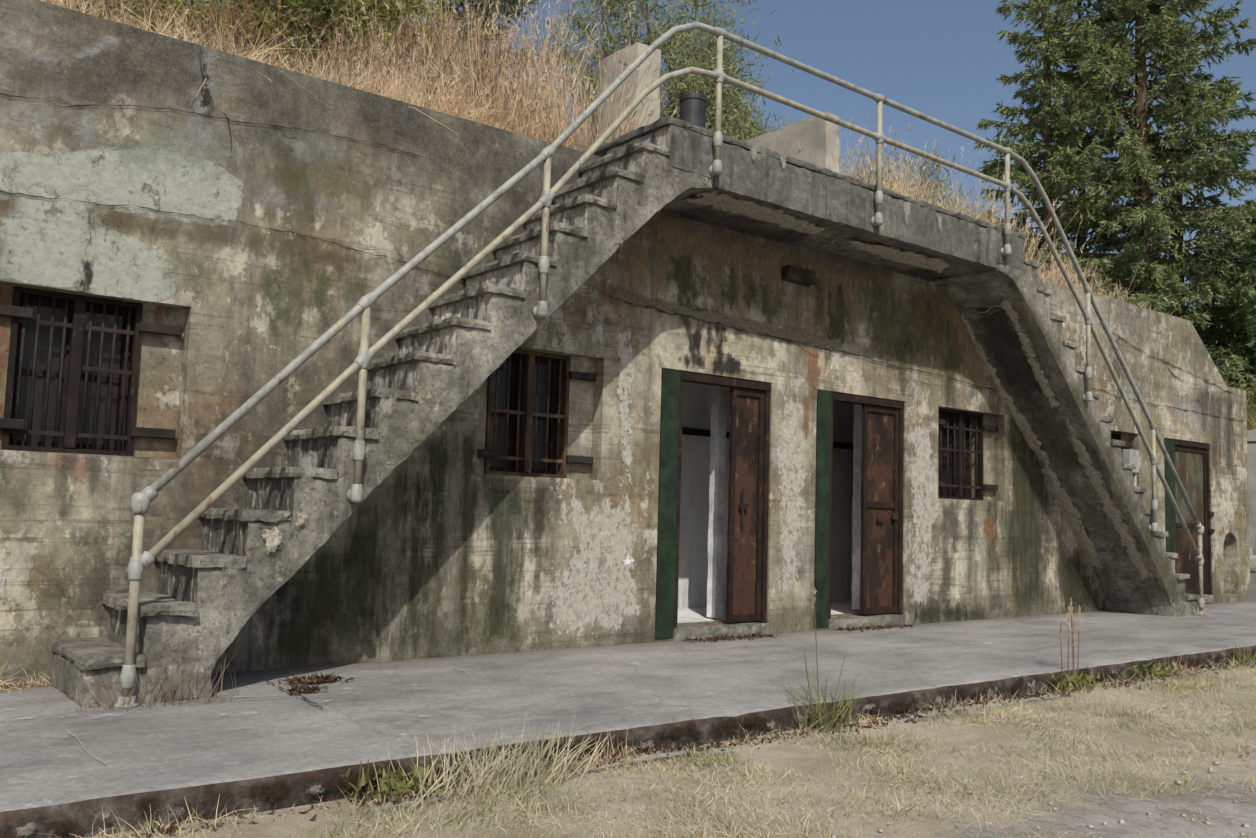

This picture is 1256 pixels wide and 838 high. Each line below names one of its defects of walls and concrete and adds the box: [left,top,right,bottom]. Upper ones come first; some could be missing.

crack [0,59,437,162]
peeling [0,134,244,302]
crack [0,190,466,284]
leakage [377,253,496,357]
leakage [629,211,875,375]
leakage [344,343,359,390]
leakage [381,398,392,413]
rust [804,346,821,437]
leakage [379,436,476,652]
leakage [533,487,546,588]
peeling [549,324,645,640]
peeling [909,424,937,606]